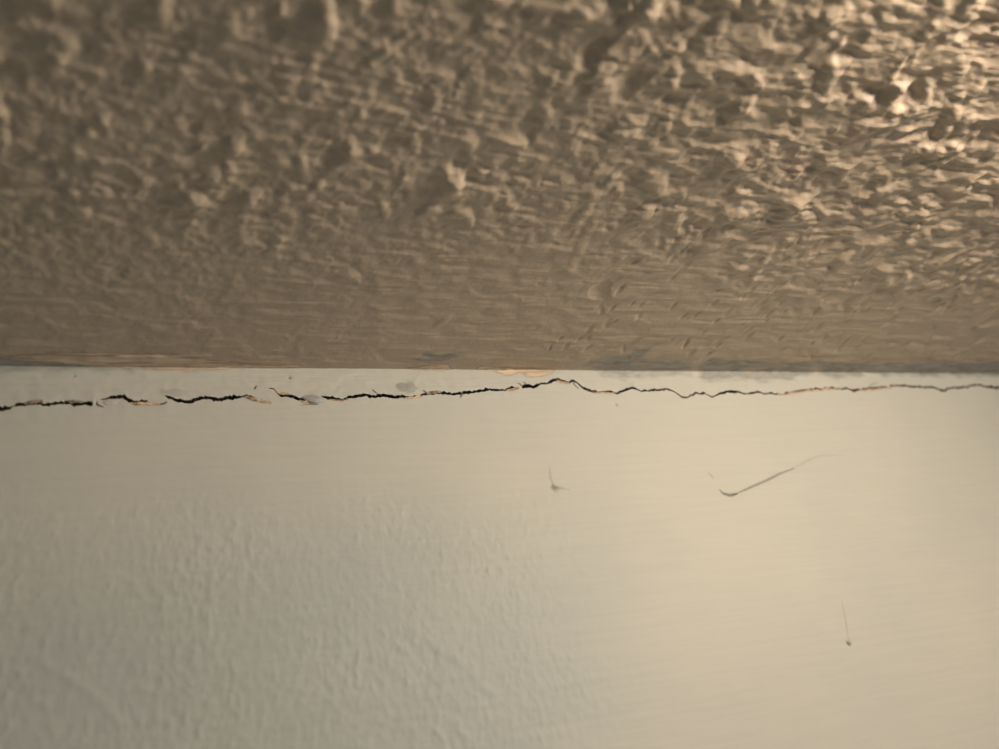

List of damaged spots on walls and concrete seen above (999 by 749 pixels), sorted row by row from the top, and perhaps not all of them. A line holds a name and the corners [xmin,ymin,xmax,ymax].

crack [0,378,999,411]